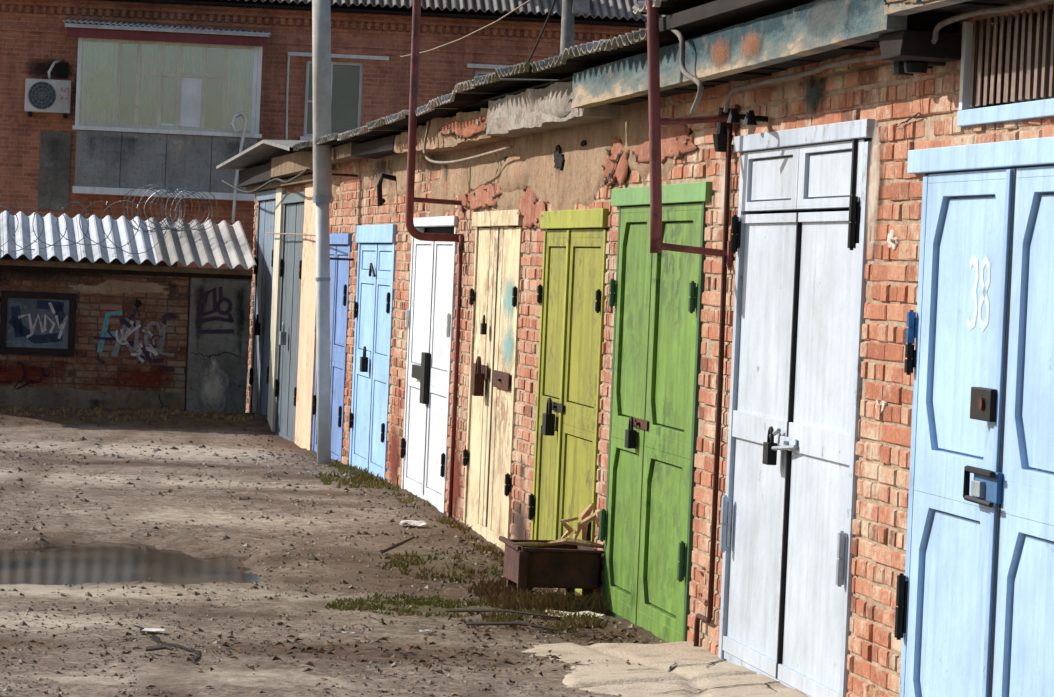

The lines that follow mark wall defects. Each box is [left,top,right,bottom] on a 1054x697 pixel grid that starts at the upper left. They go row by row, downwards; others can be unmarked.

flaking render [438,117,487,138]
hole [554,145,565,170]
peeling [601,124,697,187]
peeling [458,183,502,210]
peeling [517,185,545,228]